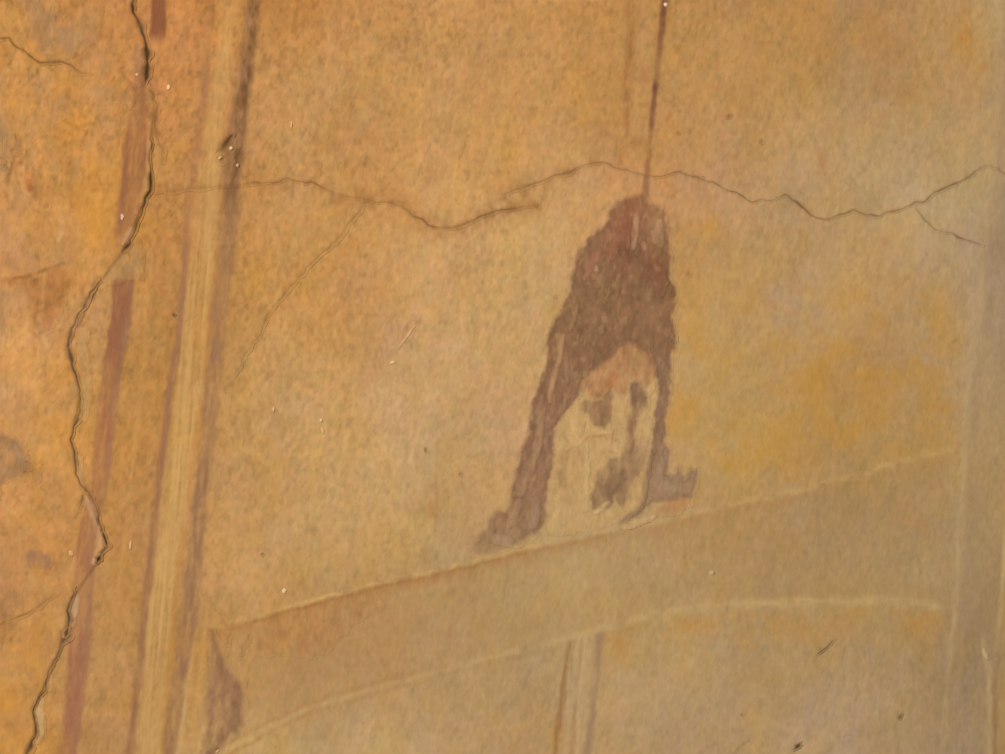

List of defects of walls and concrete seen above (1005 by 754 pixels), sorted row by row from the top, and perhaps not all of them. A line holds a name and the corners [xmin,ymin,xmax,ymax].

crack [0,35,94,76]
crack [119,0,1005,380]
crack [64,278,112,566]
crack [0,585,81,754]